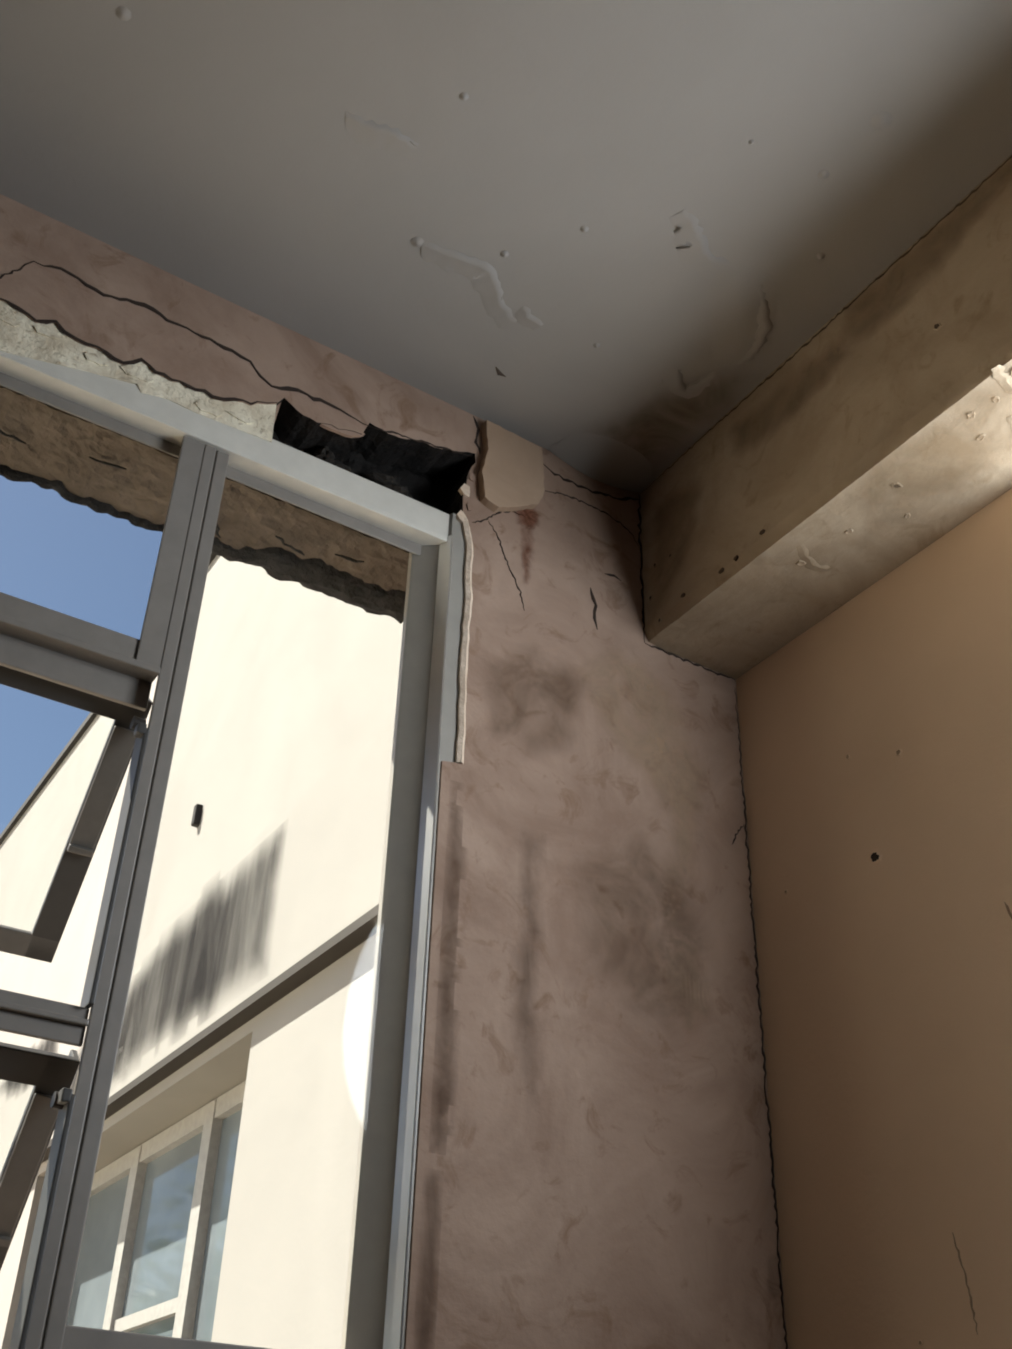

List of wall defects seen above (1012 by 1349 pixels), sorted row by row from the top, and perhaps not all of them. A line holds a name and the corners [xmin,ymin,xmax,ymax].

spalling [0,298,476,765]
crack [0,261,480,456]
crack [472,511,525,611]
crack [543,155,1012,1349]